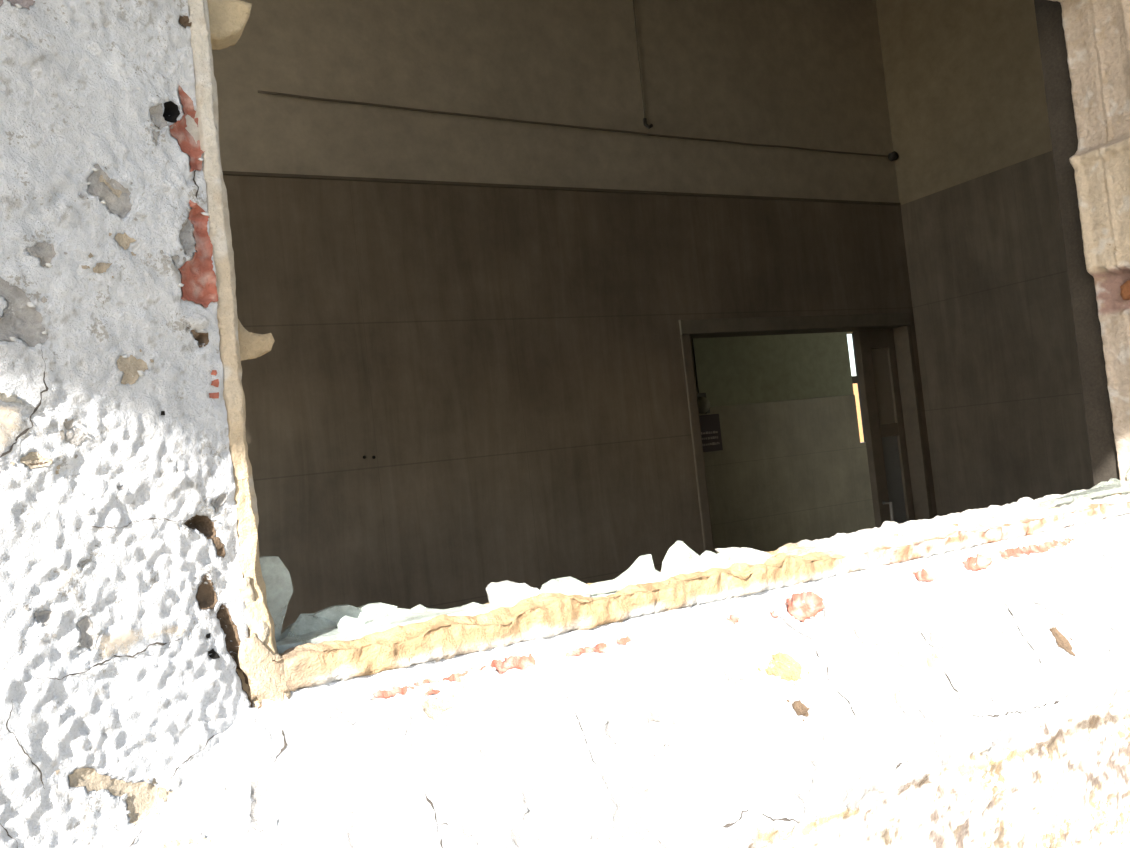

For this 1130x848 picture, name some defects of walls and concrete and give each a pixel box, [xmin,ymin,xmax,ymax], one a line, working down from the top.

flaking render [149,85,205,172]
peeling [79,164,138,221]
flaking render [160,200,218,308]
peeling [0,277,48,347]
crack [0,350,49,458]
flaking render [770,591,827,622]
crack [33,639,179,680]
crack [810,639,860,730]
crack [907,583,1068,718]
crack [6,704,45,789]
peeling [56,767,174,824]
crack [405,768,448,848]